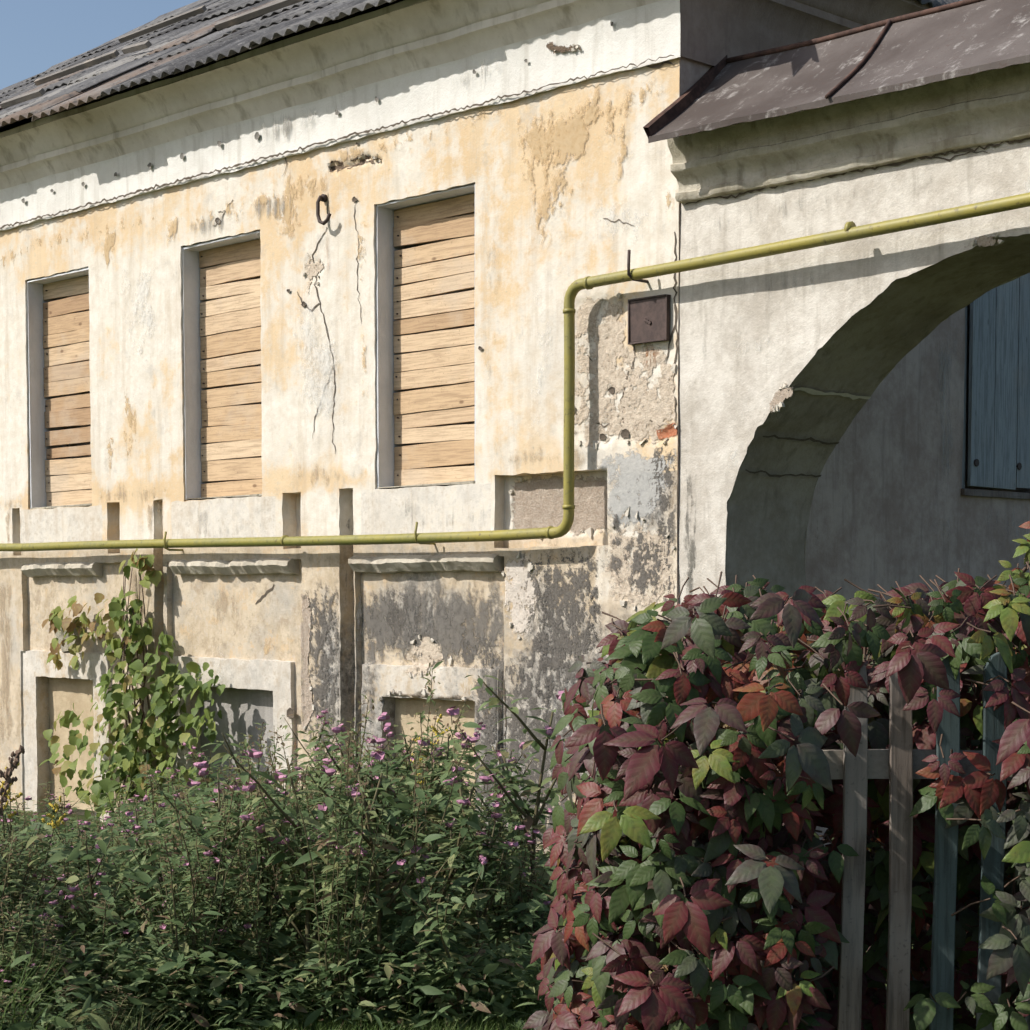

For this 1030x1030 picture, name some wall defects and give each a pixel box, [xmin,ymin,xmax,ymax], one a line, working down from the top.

peeling [195,204,237,230]
crack [297,203,336,451]
peeling [253,142,396,236]
crack [0,55,674,229]
crack [353,203,361,318]
peeling [520,84,651,240]
flaking render [508,293,678,611]
damp [306,586,339,771]
damp [353,447,695,847]